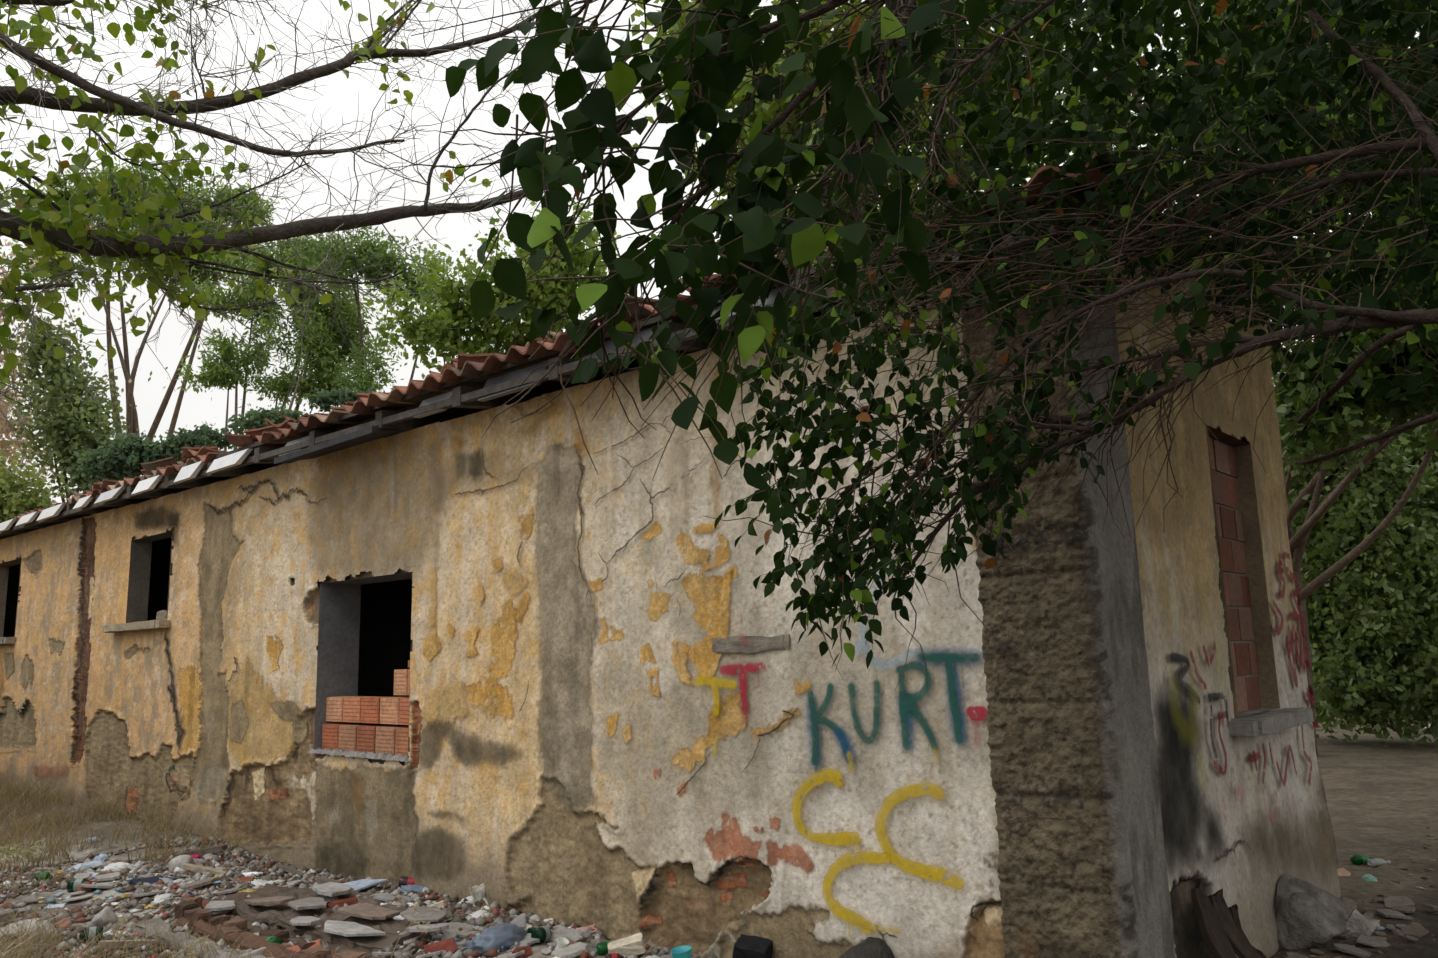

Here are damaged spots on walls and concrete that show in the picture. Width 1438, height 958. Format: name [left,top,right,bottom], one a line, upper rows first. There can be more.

crack [209,479,326,527]
crack [455,453,533,496]
crack [574,415,747,604]
peeling [23,550,42,576]
spalling [0,652,37,752]
peeling [33,444,864,958]
spalling [964,899,1005,958]